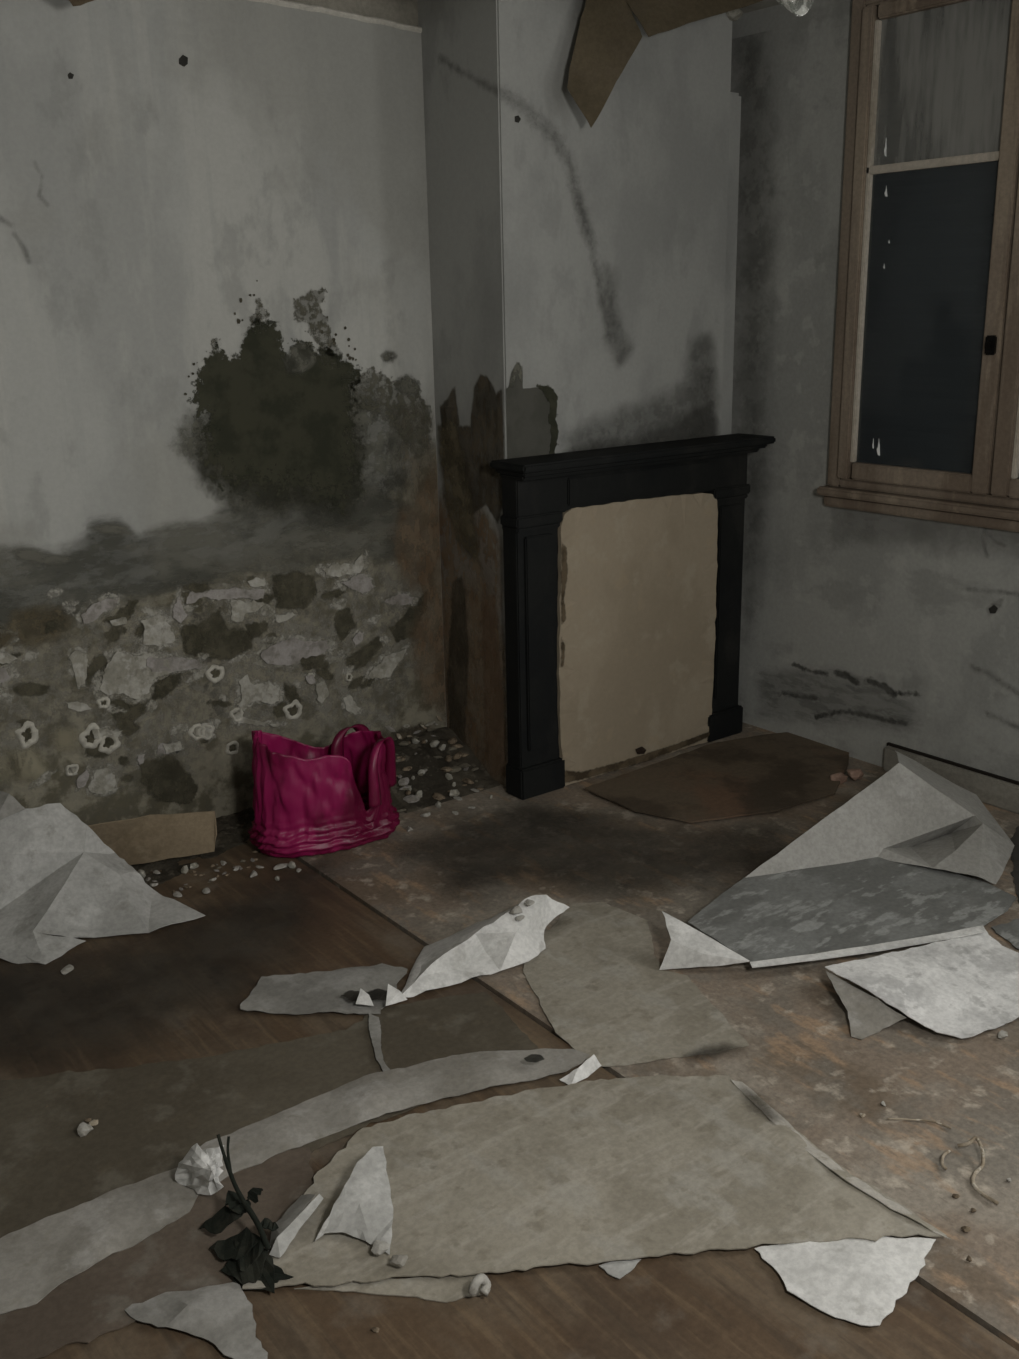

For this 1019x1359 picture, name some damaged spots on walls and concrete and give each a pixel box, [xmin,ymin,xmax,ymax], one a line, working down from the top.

peeling [0,550,442,804]
water stain [0,280,508,825]
crack [783,663,918,726]